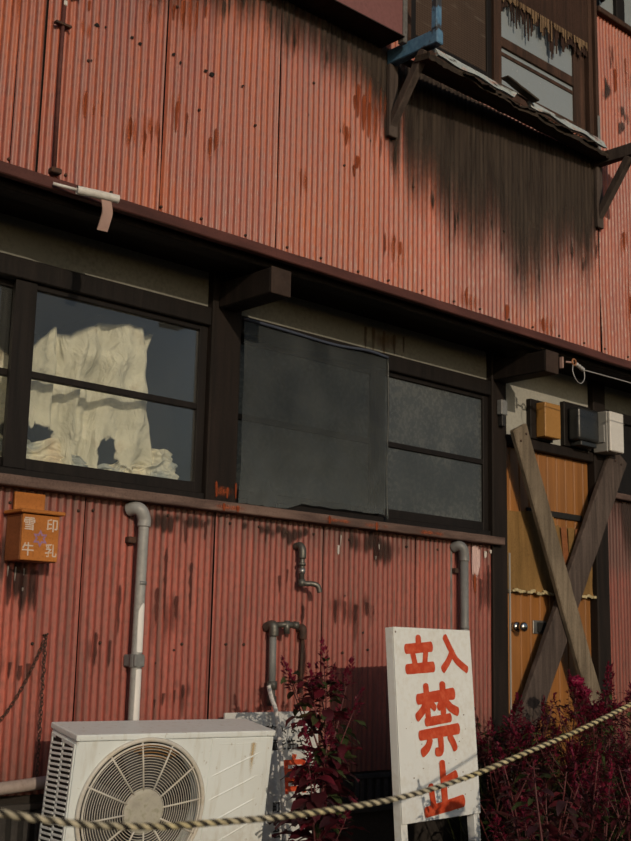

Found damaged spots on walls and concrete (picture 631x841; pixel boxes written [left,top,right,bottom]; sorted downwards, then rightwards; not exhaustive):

rust [610,48,627,92]
rust [78,92,103,117]
rust [127,118,160,173]
rust [209,128,219,157]
rust [354,84,382,154]
leakage [0,540,38,619]